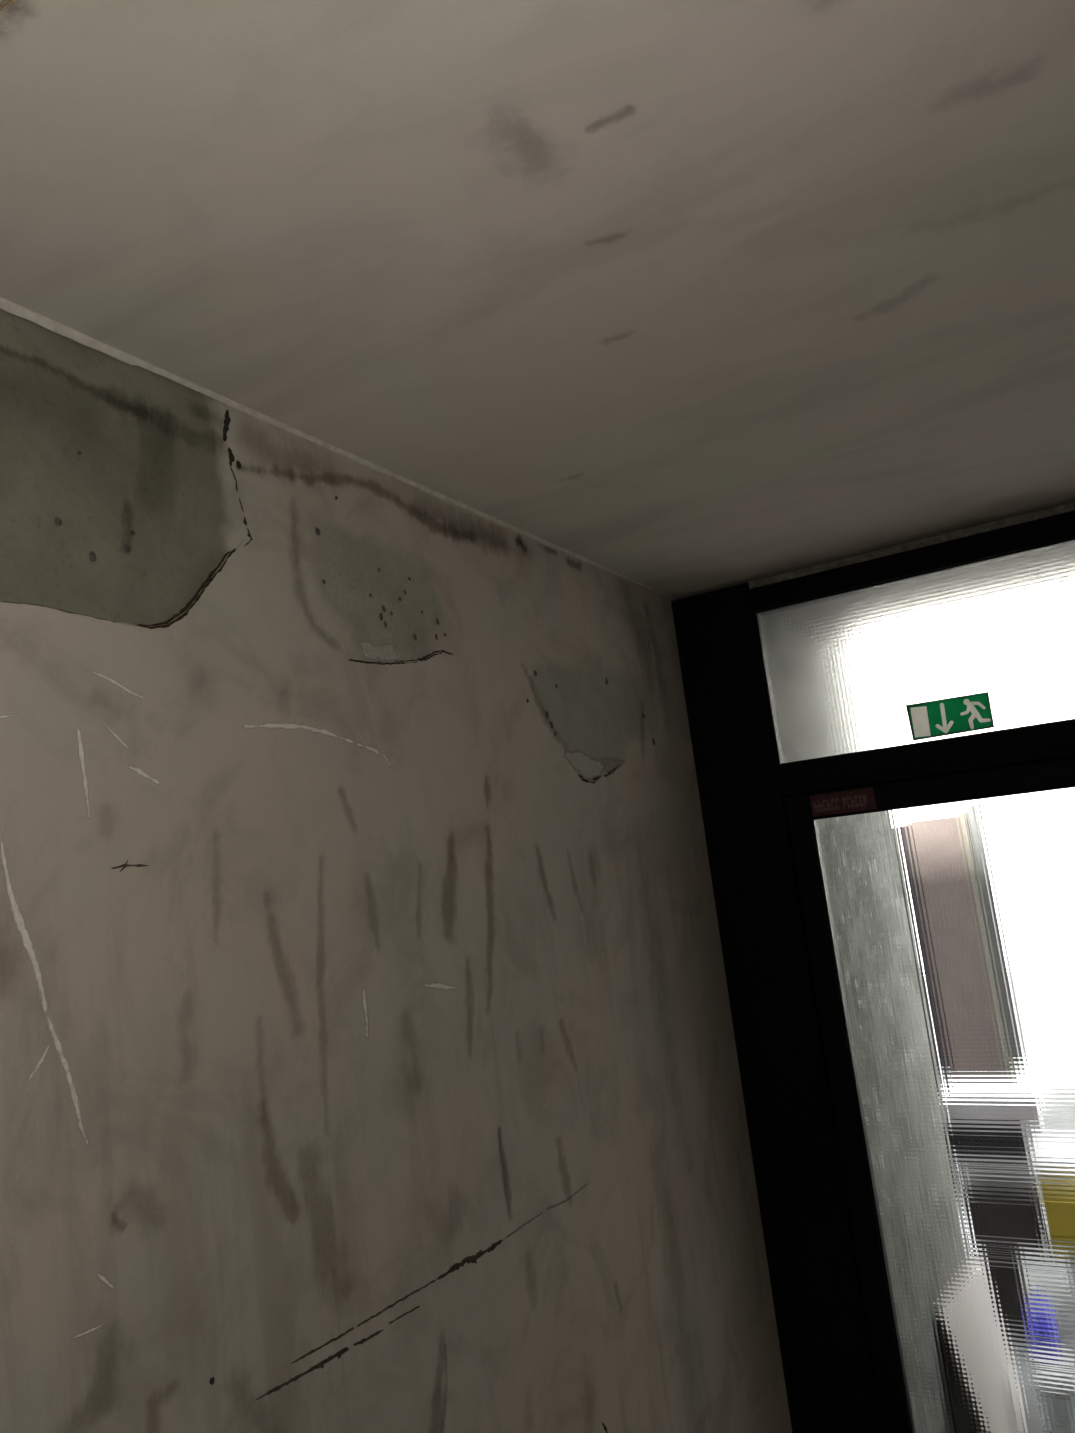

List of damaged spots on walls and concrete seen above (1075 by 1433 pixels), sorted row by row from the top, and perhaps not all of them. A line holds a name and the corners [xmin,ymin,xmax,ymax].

peeling [0,309,247,631]